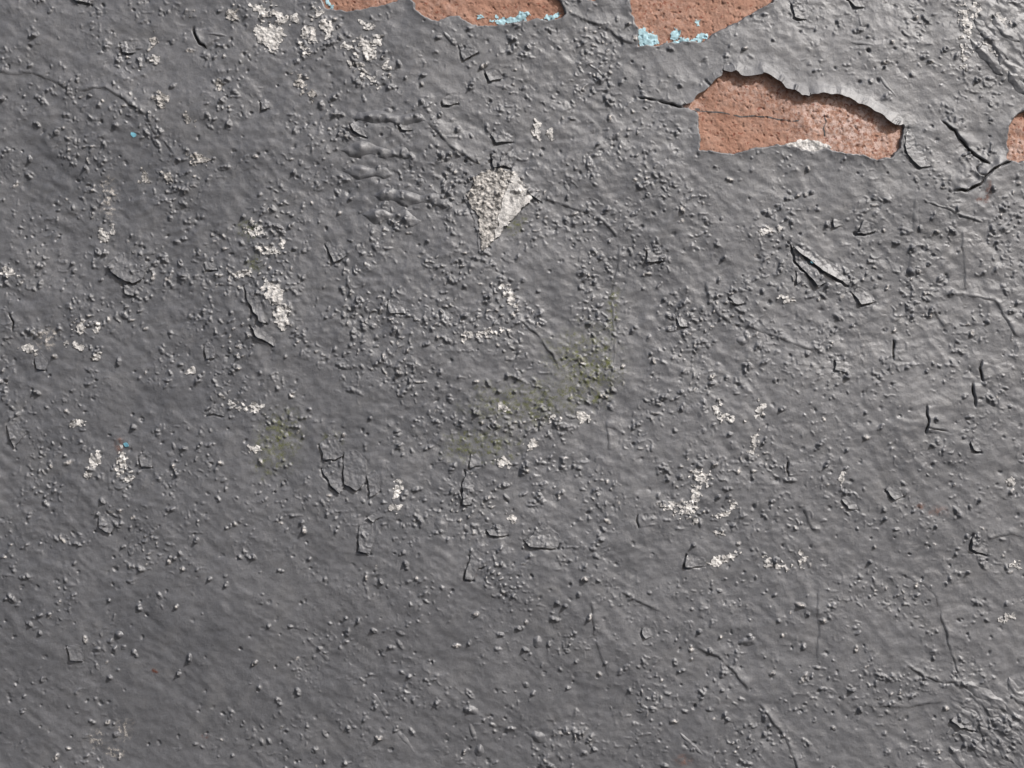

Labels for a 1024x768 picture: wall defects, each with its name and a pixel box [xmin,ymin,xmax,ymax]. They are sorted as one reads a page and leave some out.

peeling [413,0,565,26]
peeling [630,0,772,46]
peeling [682,61,930,167]
crack [941,120,1012,192]
peeling [1007,112,1024,162]
flaking render [463,132,541,253]